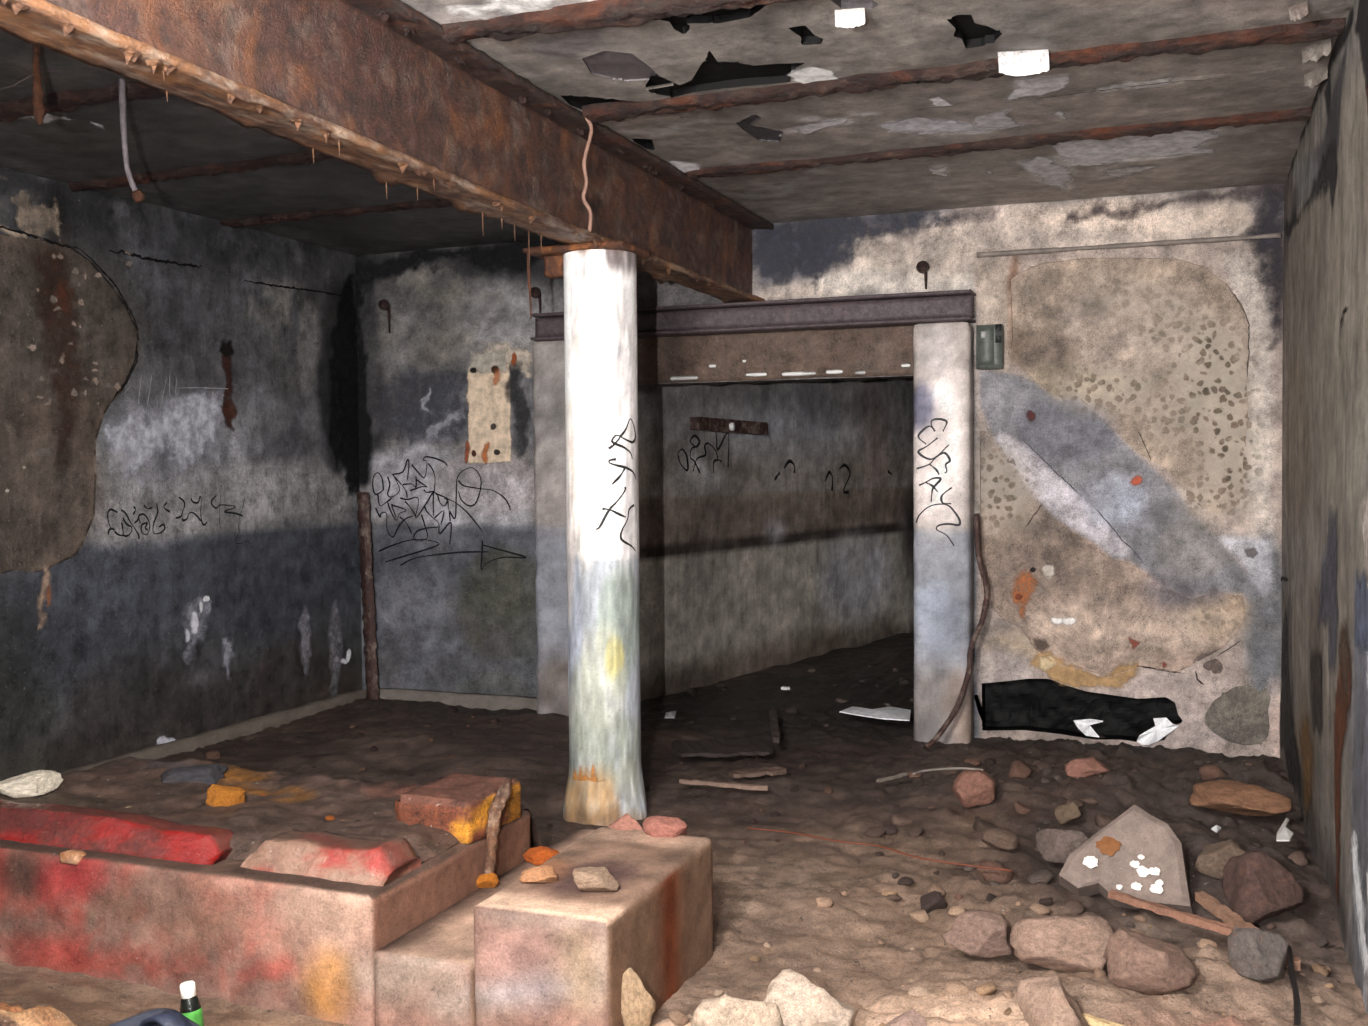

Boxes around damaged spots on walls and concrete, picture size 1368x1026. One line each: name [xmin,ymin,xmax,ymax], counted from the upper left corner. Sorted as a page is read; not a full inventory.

corrosion [0,0,29,15]
spalling [560,51,838,109]
peeling [881,15,1069,135]
crack [0,226,201,399]
crack [244,280,345,296]
corrosion [482,201,542,262]
corrosion [220,341,237,431]
flaking render [465,350,516,463]
spalling [980,430,1245,742]
leakage [1310,510,1337,737]
leakage [1279,608,1301,795]
leakage [1351,831,1368,974]